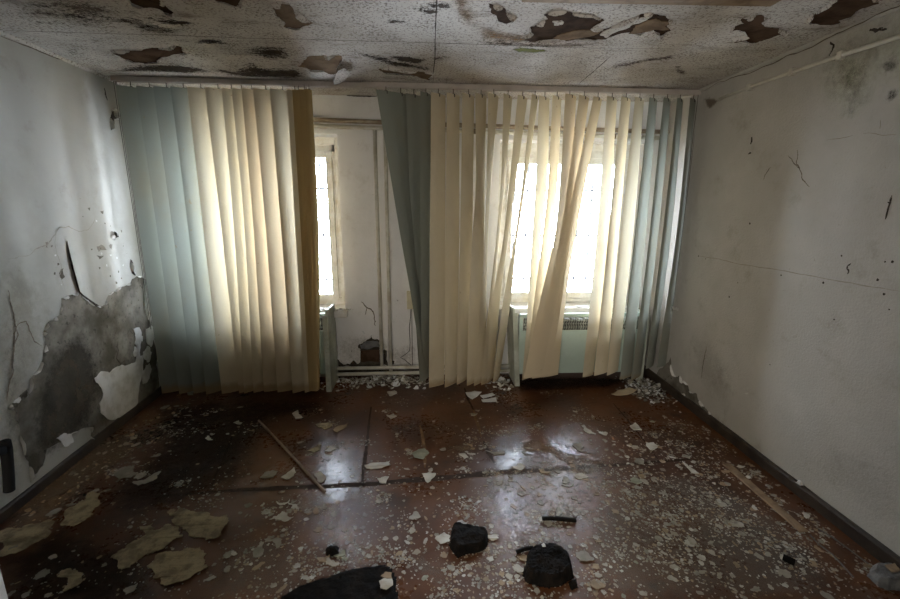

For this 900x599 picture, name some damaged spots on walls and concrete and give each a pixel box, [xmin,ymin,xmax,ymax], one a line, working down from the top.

leakage [16,0,191,33]
leakage [418,2,450,14]
peeling [524,11,673,43]
peeling [730,15,790,45]
peeling [807,0,879,27]
leakage [122,64,206,74]
leakage [219,47,301,78]
leakage [359,53,428,70]
crack [763,151,808,186]
crack [11,219,99,308]
spalling [8,208,160,483]
spalling [338,335,419,377]